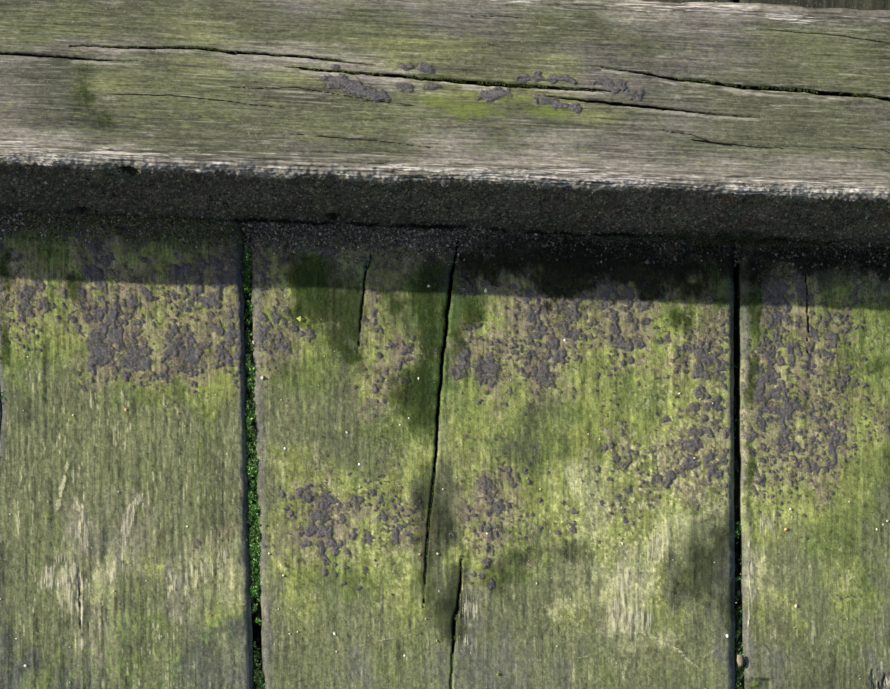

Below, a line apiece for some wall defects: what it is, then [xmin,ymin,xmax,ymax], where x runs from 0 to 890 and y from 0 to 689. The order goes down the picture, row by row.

crack [0,45,783,149]
crack [614,69,890,102]
crack [491,229,672,238]
damp [456,231,890,309]
crack [216,219,467,608]
crack [449,559,462,689]